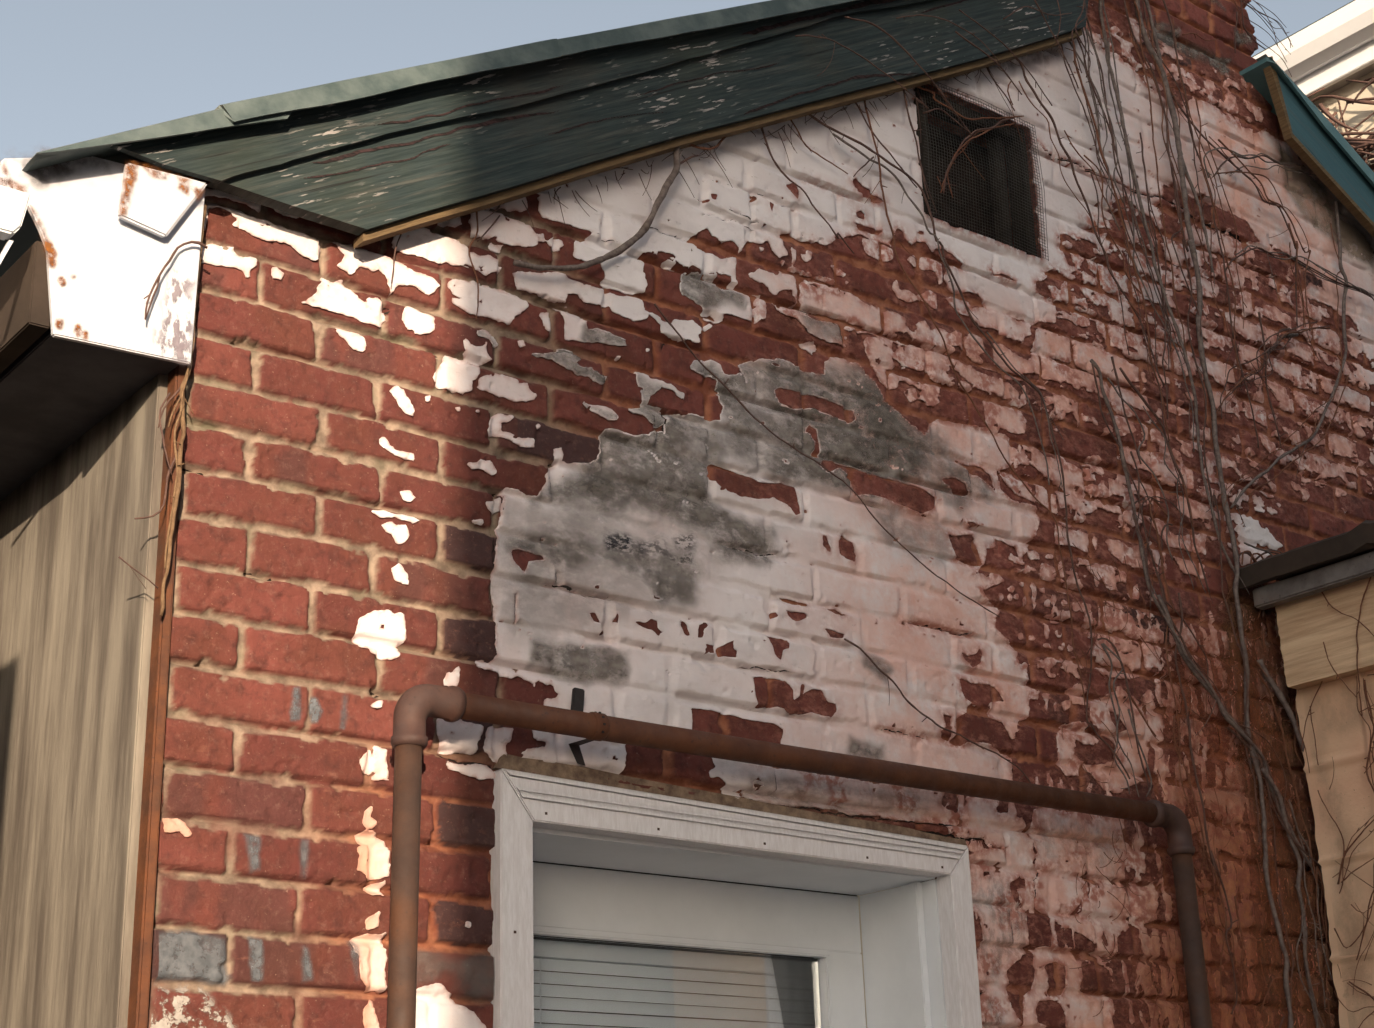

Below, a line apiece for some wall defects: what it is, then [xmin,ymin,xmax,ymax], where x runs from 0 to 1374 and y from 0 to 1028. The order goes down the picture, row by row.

peeling [204,188,320,261]
peeling [201,244,284,280]
damp [533,328,625,383]
damp [550,360,986,603]
peeling [302,15,1374,1028]
damp [532,643,628,682]